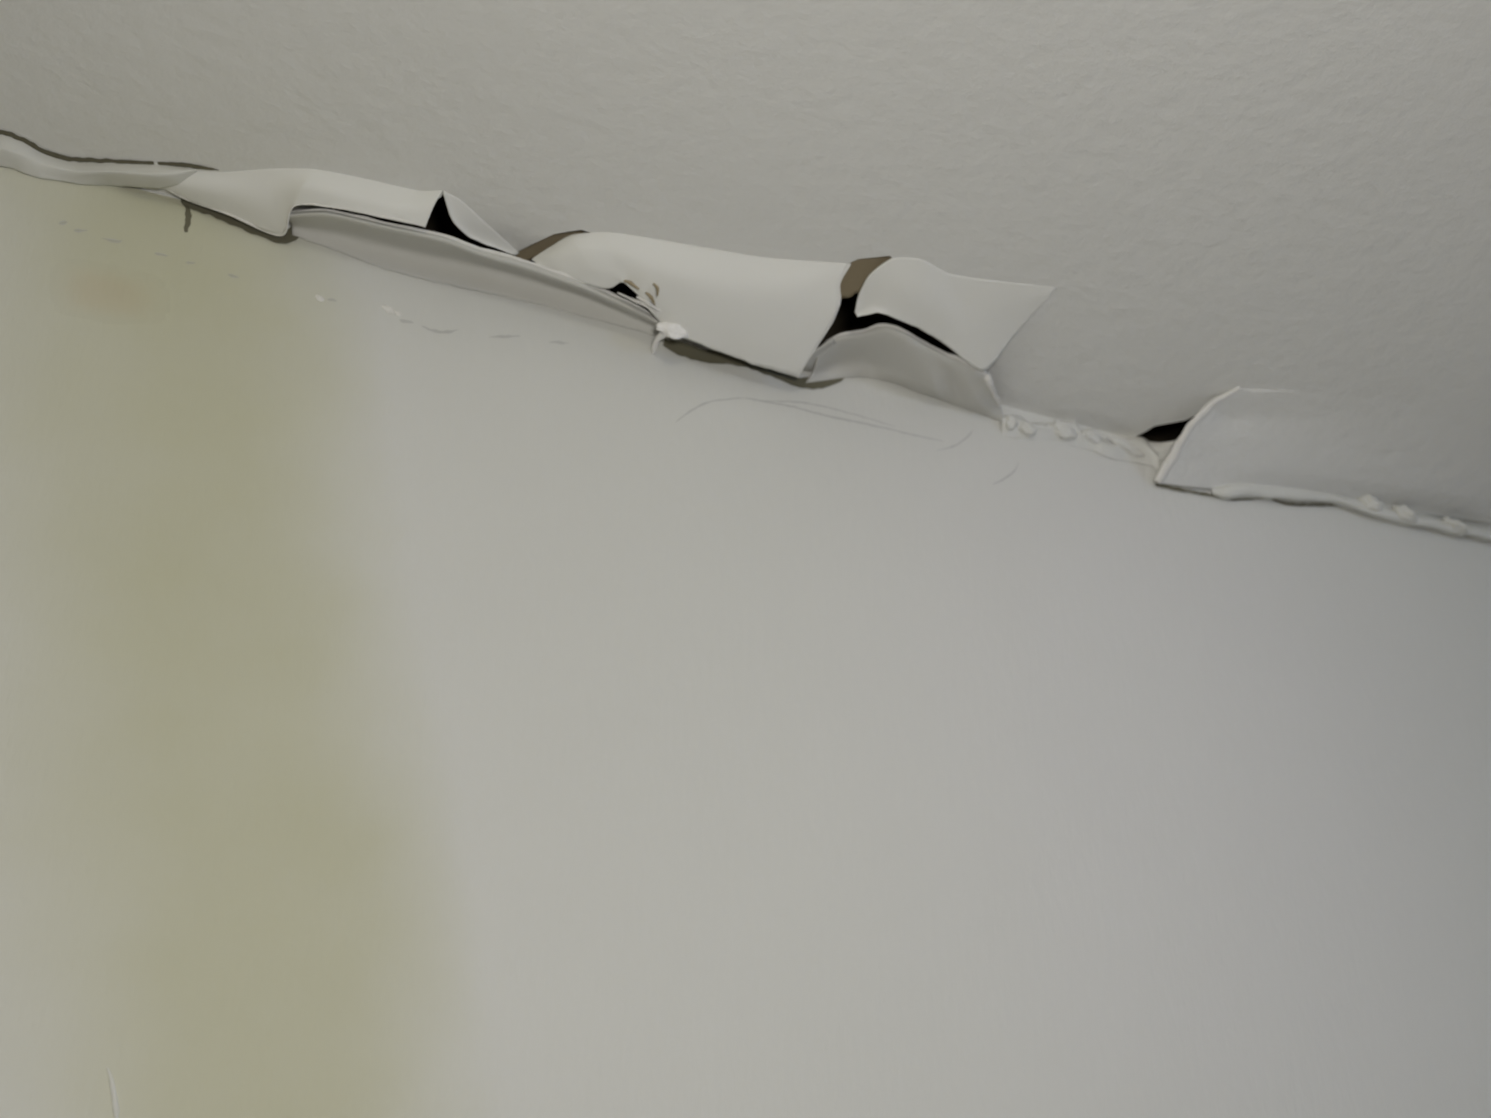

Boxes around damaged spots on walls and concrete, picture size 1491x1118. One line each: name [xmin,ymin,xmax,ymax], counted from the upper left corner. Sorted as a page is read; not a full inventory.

crack [0,130,219,264]
peeling [164,168,1057,378]
peeling [1001,386,1491,524]